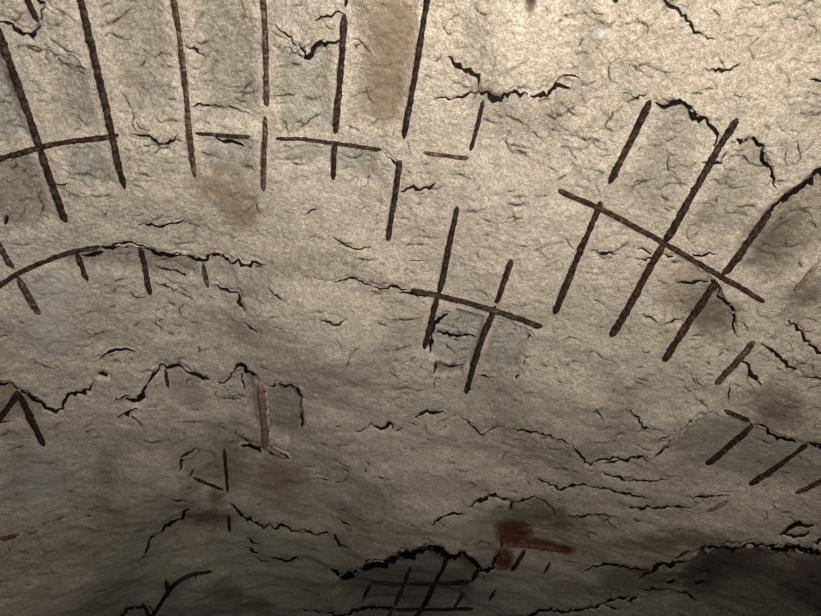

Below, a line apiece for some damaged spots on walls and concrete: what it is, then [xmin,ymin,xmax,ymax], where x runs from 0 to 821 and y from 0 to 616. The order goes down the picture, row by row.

crack [0,0,46,39]
spalling [0,0,126,223]
crack [131,123,178,145]
spalling [171,0,251,177]
crack [191,103,250,114]
crack [276,10,344,60]
spalling [402,0,431,140]
spalling [552,100,821,362]
spalling [0,242,191,315]
spalling [411,206,543,394]
crack [757,424,821,450]
corrosion [496,521,574,569]